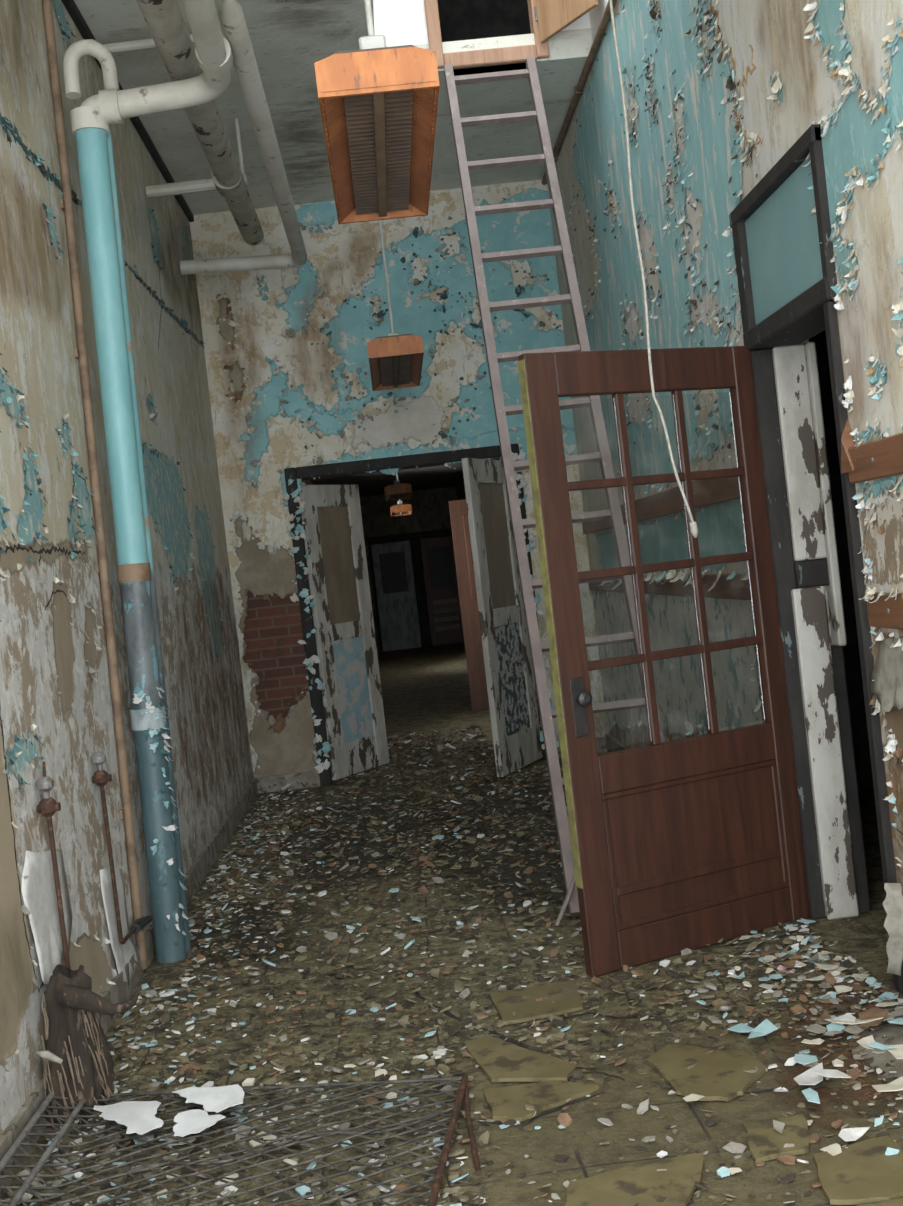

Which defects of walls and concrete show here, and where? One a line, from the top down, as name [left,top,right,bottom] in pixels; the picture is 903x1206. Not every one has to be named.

peeling [567,0,763,351]
peeling [802,0,903,310]
peeling [842,258,903,413]
peeling [216,181,565,790]
peeling [599,388,735,497]
peeling [592,498,763,739]
flaking render [852,475,903,603]
flaking render [0,719,139,1084]
crack [414,992,673,1127]
crack [744,1087,798,1096]
peeling [726,919,903,1104]
crack [462,1195,488,1206]